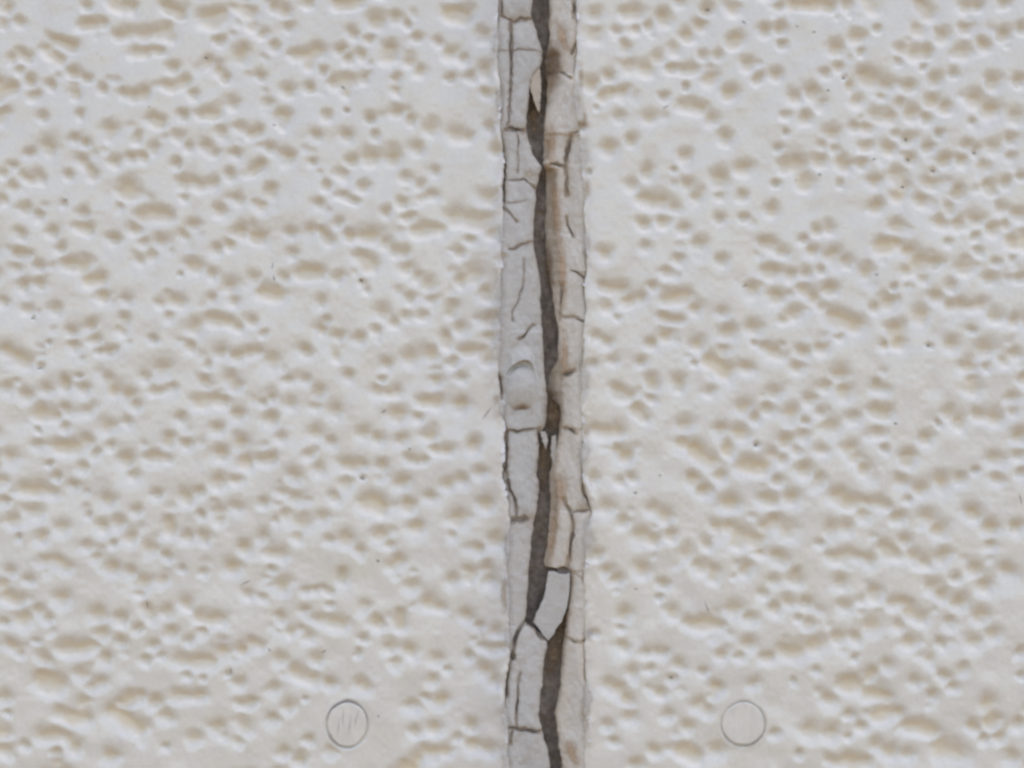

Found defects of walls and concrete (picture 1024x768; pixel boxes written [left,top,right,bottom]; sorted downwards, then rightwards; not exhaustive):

crack [501,0,589,768]